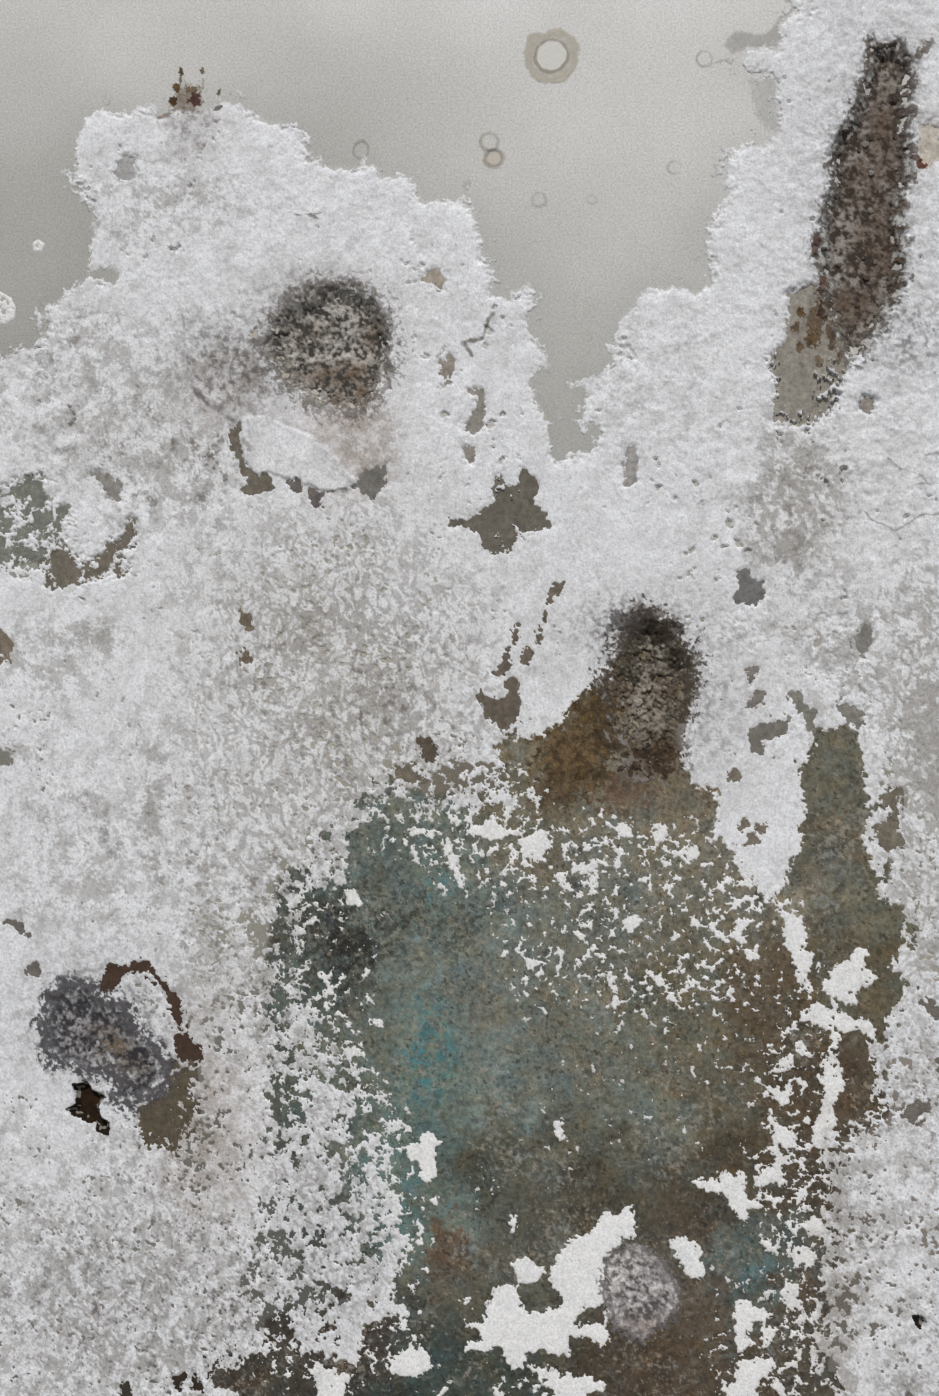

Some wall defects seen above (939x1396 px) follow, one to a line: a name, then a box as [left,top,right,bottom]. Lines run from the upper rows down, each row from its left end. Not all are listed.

corrosion [169,67,222,110]
leakage [0,84,554,1396]
corrosion [527,688,684,814]
leakage [436,0,939,1396]